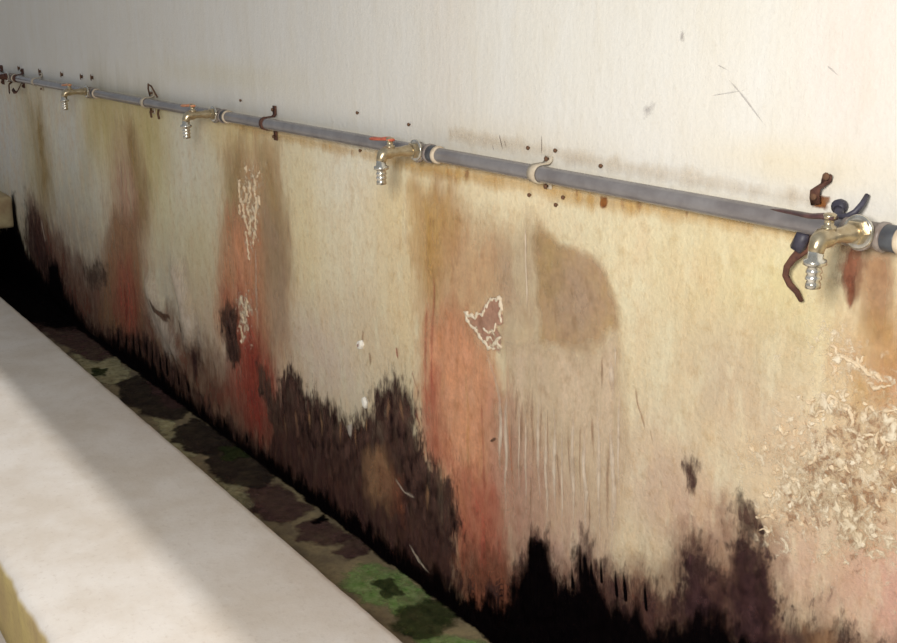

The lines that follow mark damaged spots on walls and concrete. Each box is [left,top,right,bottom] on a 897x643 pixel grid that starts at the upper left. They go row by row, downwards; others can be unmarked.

corrosion [100,137,144,334]
damp [238,165,262,260]
corrosion [223,157,279,437]
damp [0,195,897,643]
corrosion [423,204,534,612]
peeling [464,295,504,351]
corrosion [842,248,891,332]